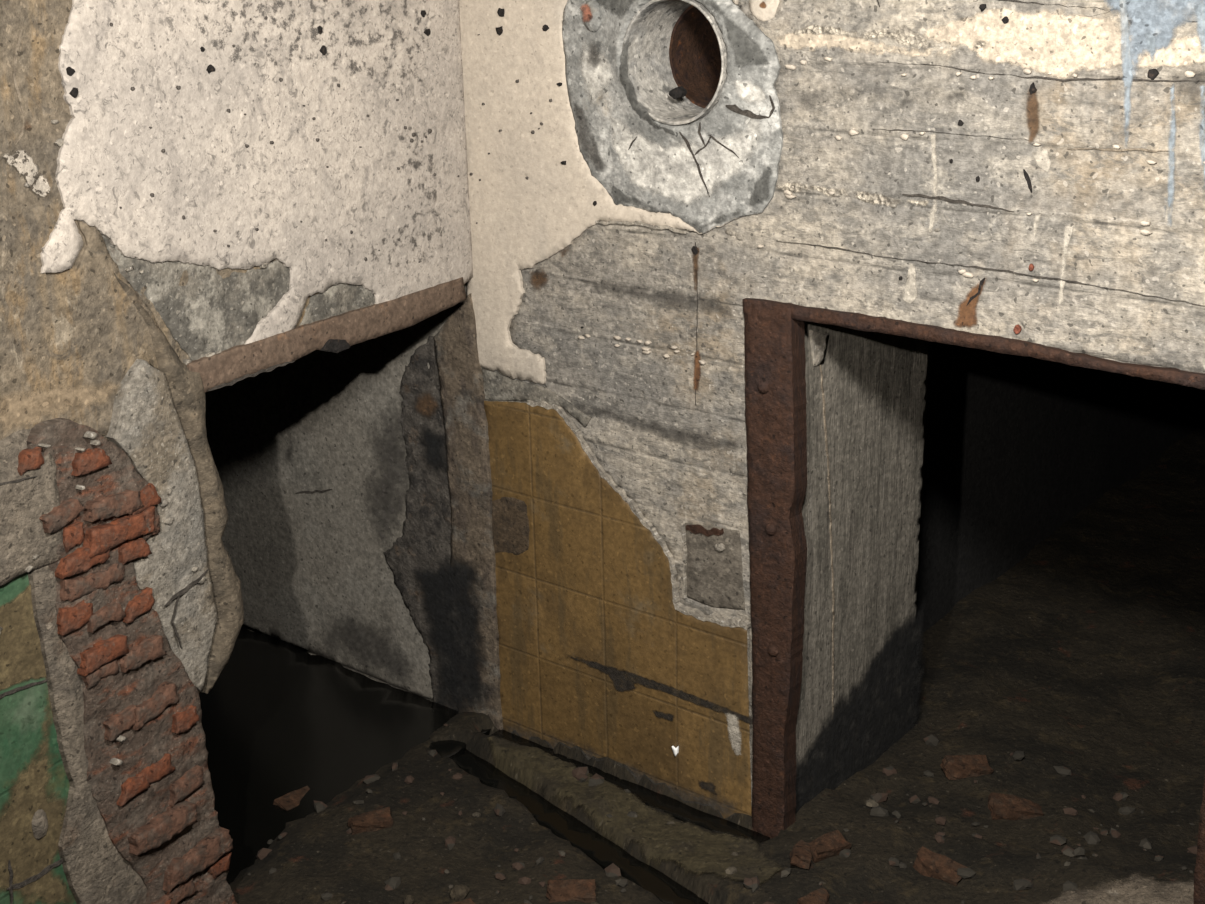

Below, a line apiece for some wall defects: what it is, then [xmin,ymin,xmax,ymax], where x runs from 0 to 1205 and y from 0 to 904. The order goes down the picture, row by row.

crack [725,95,775,119]
water stain [1184,76,1202,94]
crack [679,122,739,197]
rust [691,246,699,289]
flaking render [484,0,1205,625]
rust [955,278,985,327]
spalling [0,0,290,904]
crack [0,476,37,485]